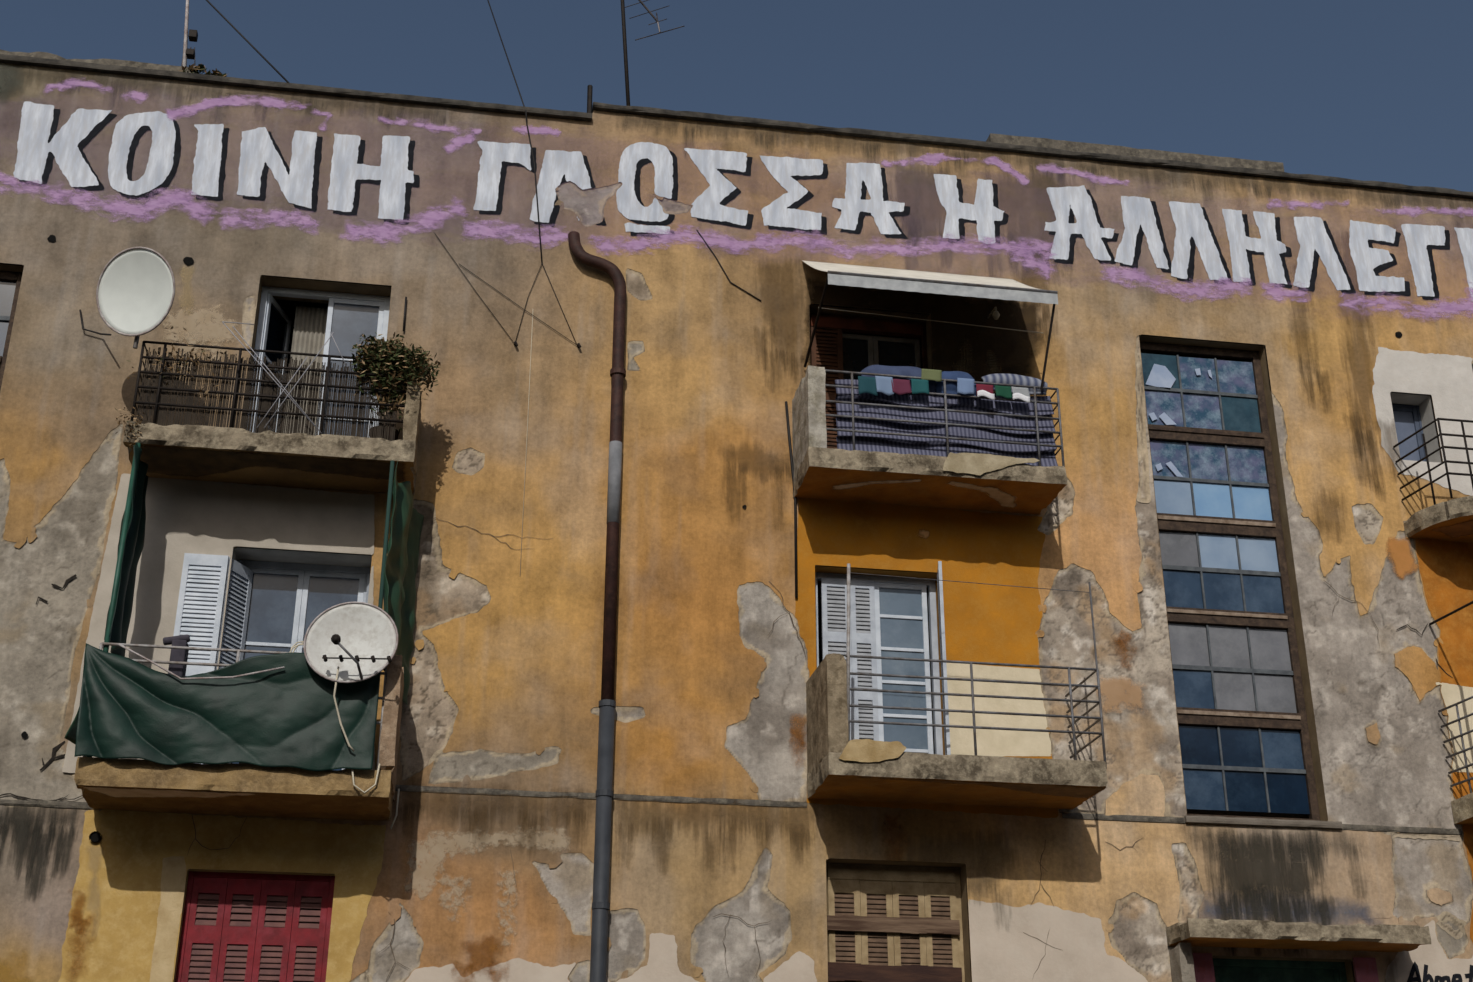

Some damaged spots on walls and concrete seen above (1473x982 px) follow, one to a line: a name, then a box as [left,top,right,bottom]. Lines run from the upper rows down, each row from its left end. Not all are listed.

spalling [724,582,809,802]
spalling [833,335,1187,817]